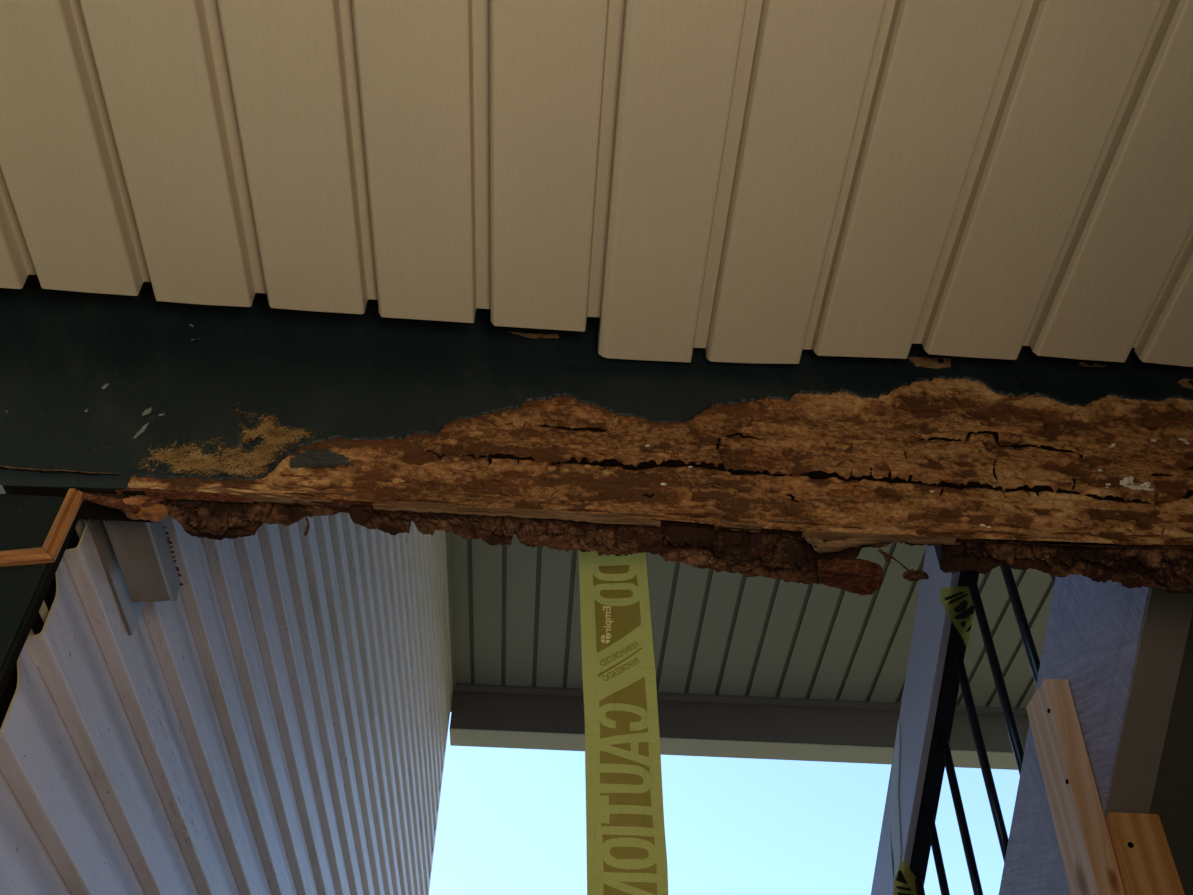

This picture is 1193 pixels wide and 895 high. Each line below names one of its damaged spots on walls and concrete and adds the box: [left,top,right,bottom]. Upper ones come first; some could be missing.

peeling [137,403,317,480]
crack [426,424,1193,505]